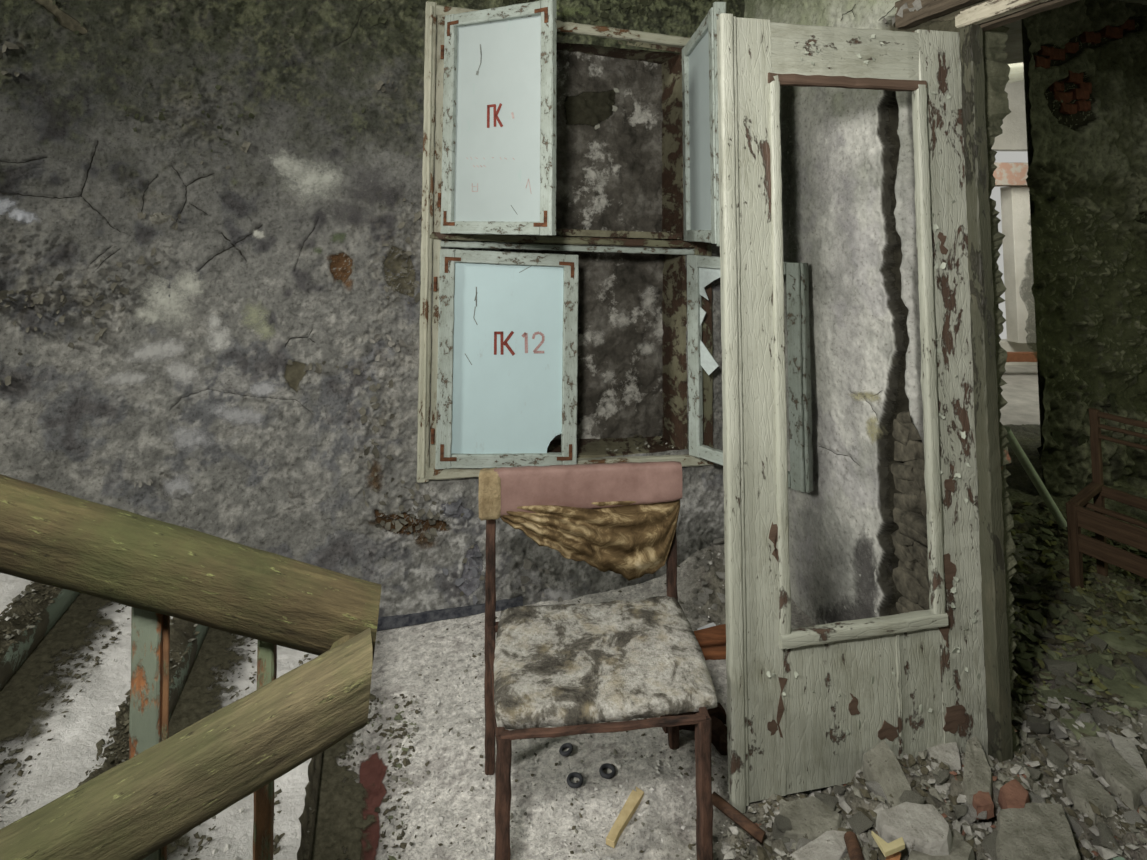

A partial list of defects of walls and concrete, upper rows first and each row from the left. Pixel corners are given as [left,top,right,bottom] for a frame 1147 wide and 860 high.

spalling [882,0,988,26]
spalling [1029,16,1143,131]
crack [1,140,262,271]
peeling [931,213,948,269]
flaking render [284,333,469,542]
peeling [944,463,971,503]
peeling [769,522,778,561]
peeling [938,553,969,662]
peeling [766,671,798,738]
peeling [846,693,861,735]
peeling [878,720,899,742]
peeling [919,704,967,734]